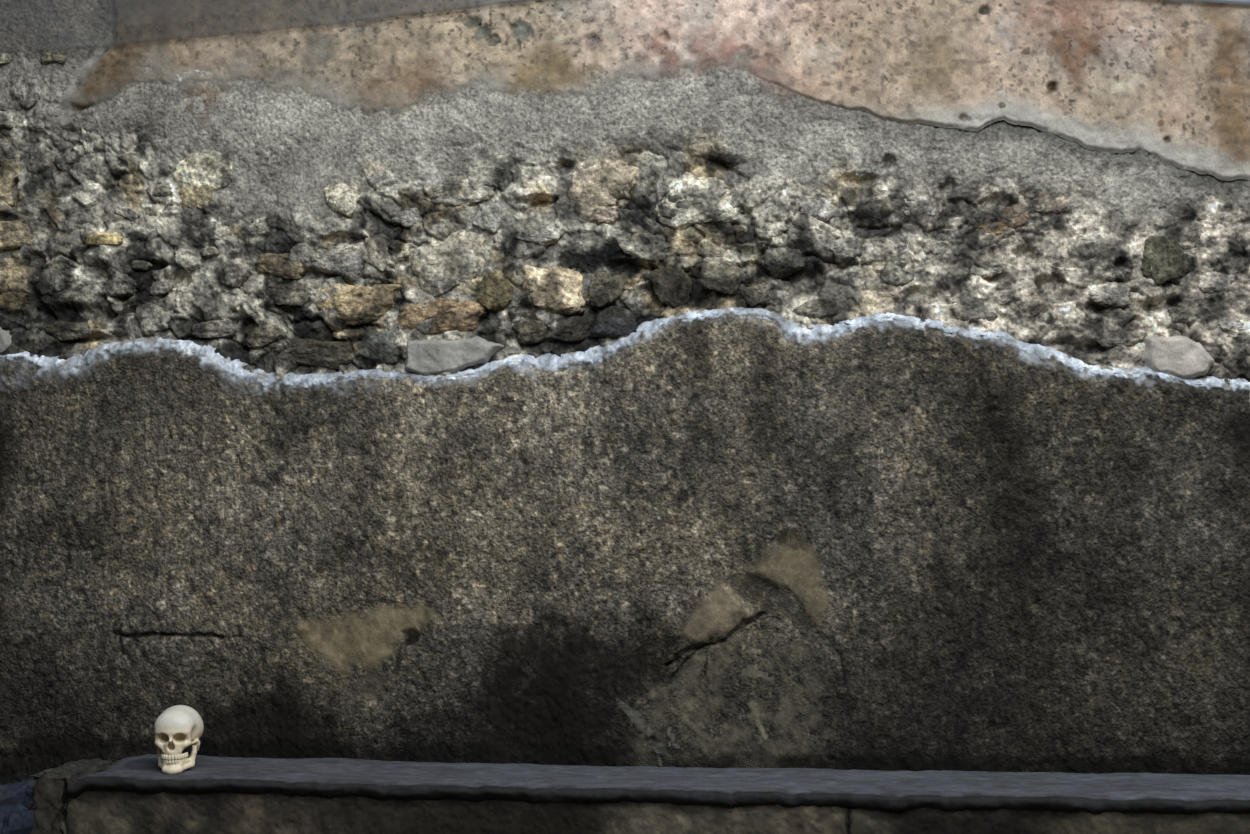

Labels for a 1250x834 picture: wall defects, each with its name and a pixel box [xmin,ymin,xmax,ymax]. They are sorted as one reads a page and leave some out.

flaking render [0,0,1250,404]
crack [113,624,243,654]
flaking render [299,608,432,664]
crack [665,612,781,678]